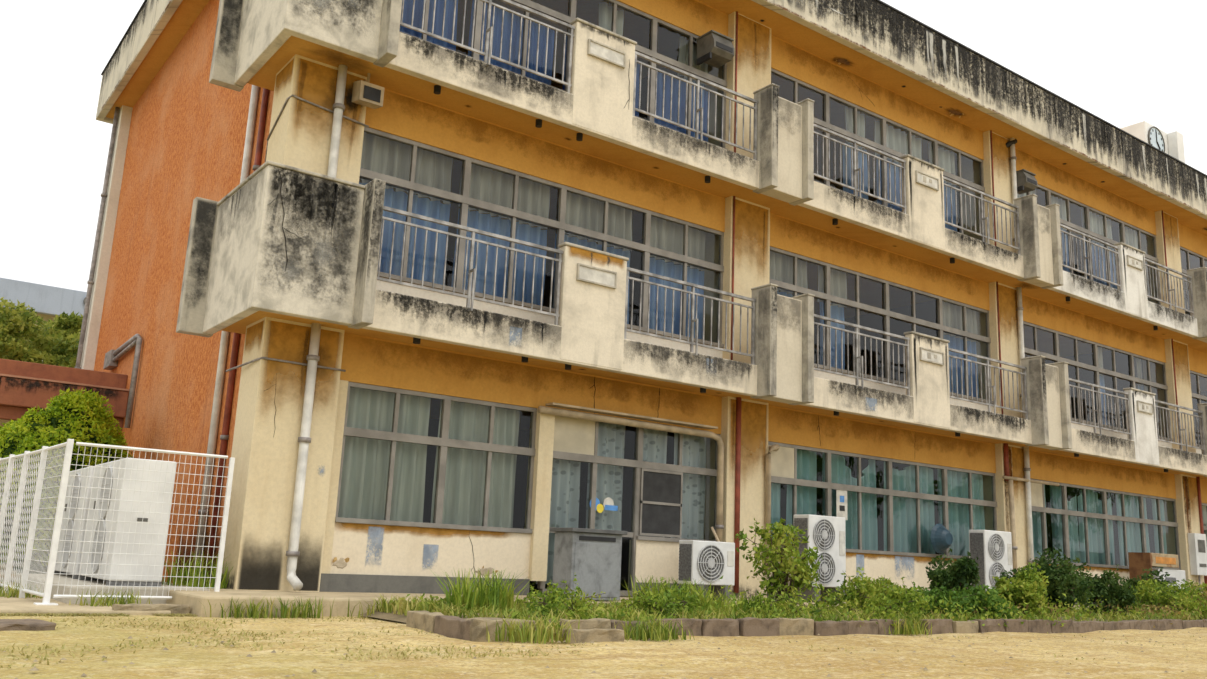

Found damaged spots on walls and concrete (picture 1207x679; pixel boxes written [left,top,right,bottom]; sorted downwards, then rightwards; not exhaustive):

damp [102,1,153,81]
damp [219,0,243,49]
damp [406,36,558,97]
damp [831,160,943,221]
damp [192,189,241,299]
damp [269,167,384,299]
damp [735,199,768,256]
damp [383,291,547,339]
damp [245,321,340,394]
damp [637,341,752,375]
damp [226,553,281,590]
damp [296,551,320,591]